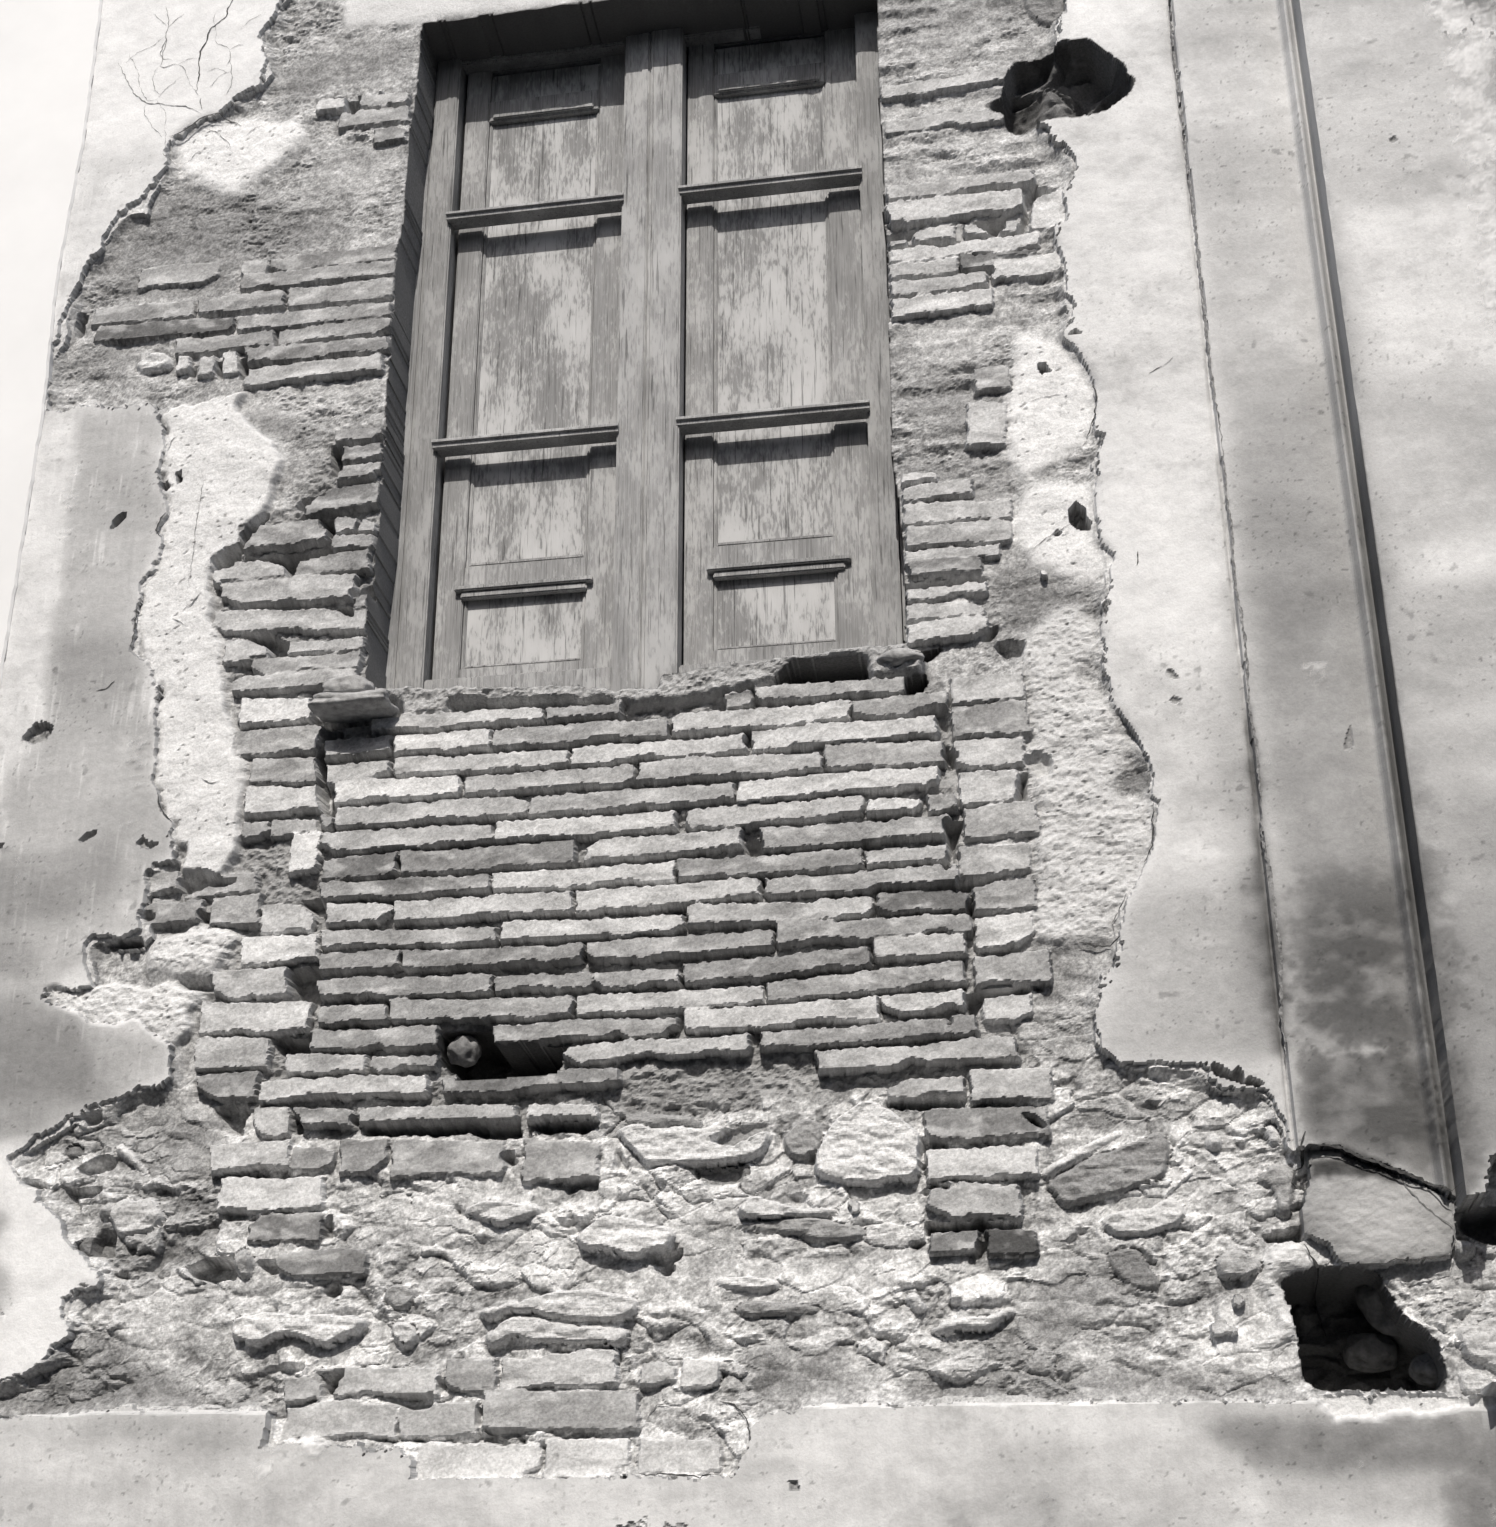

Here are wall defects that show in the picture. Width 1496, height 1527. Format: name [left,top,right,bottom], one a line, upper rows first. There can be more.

crack [118,0,262,166]
damp [1428,0,1496,320]
flaking render [24,720,54,744]
flaking render [47,0,602,1107]
flaking render [256,0,1161,1142]
flaking render [1168,668,1183,704]
flaking render [0,900,1496,1482]
peeling [617,1516,689,1527]